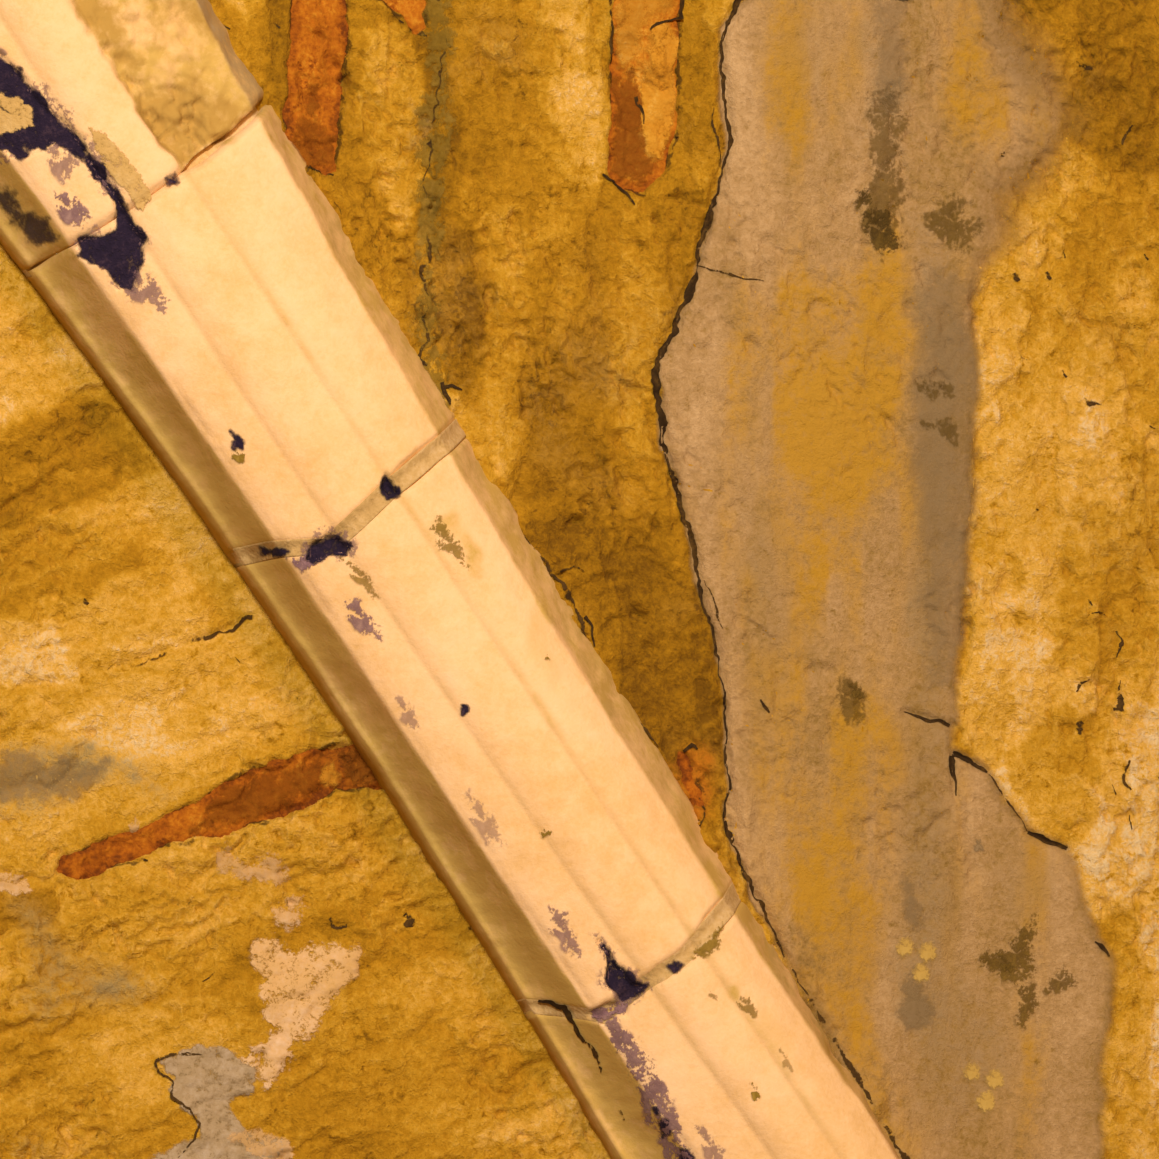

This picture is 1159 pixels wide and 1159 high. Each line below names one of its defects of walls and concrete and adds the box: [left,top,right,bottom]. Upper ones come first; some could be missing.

water stain [855,190,902,252]
water stain [924,199,982,250]
flaking render [658,0,1114,1159]
spalling [1113,680,1124,711]
flaking render [56,742,382,885]
peeling [0,873,32,896]
peeling [153,895,363,1159]
water stain [980,914,1078,1028]